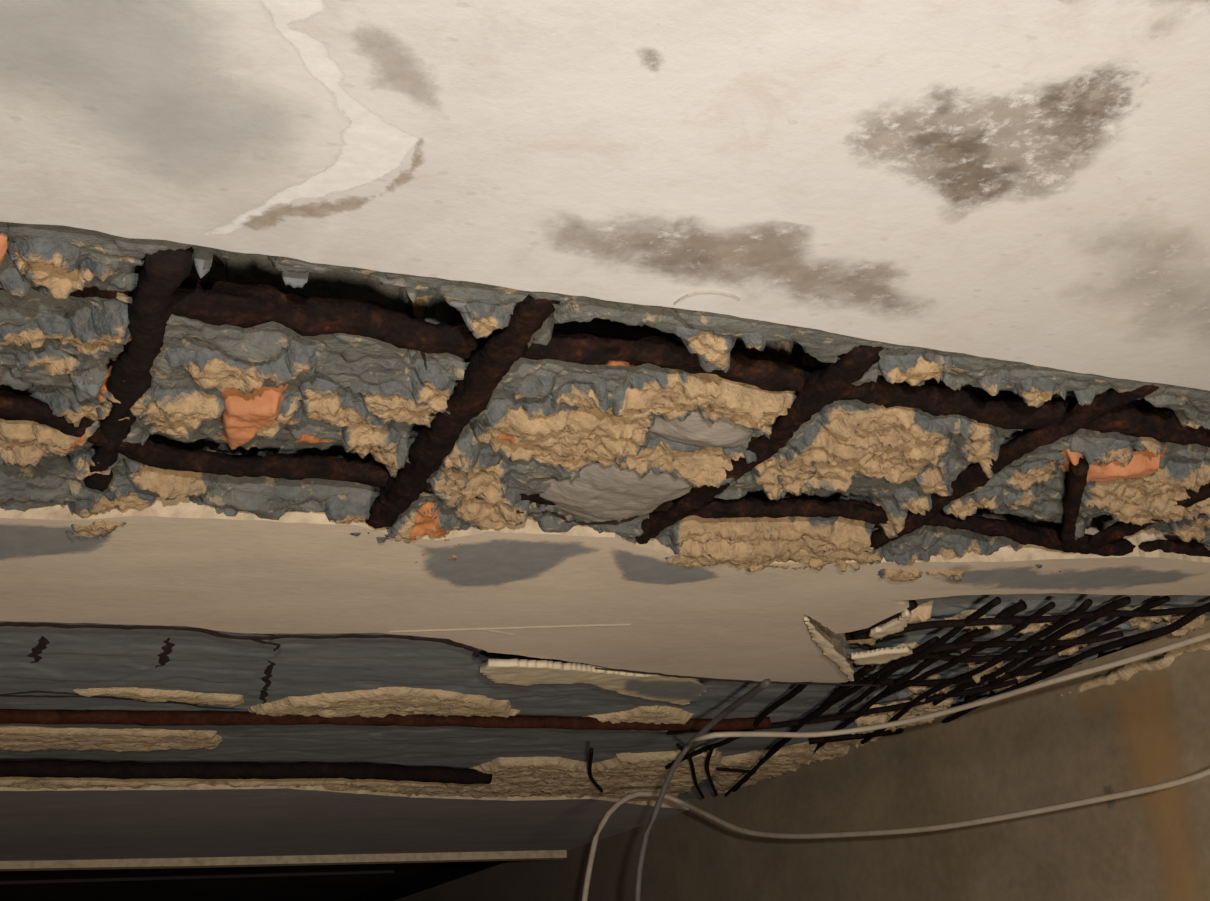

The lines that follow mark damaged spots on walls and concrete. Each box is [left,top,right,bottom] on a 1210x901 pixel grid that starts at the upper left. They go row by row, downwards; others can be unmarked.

water stain [205,0,430,235]
water stain [858,73,1127,205]
water stain [565,226,899,307]
corrosion [97,363,112,402]
corrosion [293,434,337,443]
corrosion [410,501,446,540]
spalling [0,222,1210,802]
water stain [427,541,590,586]
water stain [616,551,715,584]